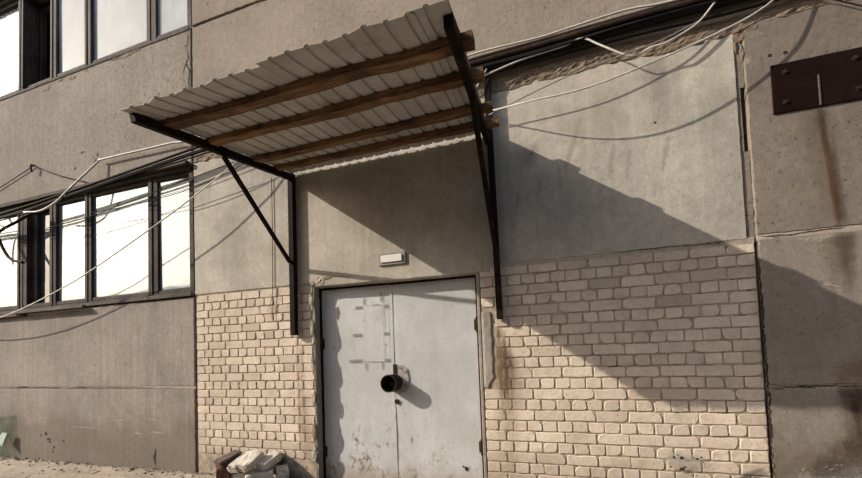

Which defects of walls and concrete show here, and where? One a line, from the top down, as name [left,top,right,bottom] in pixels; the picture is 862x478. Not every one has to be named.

crack [182,36,190,88]
corrosion [823,127,839,217]